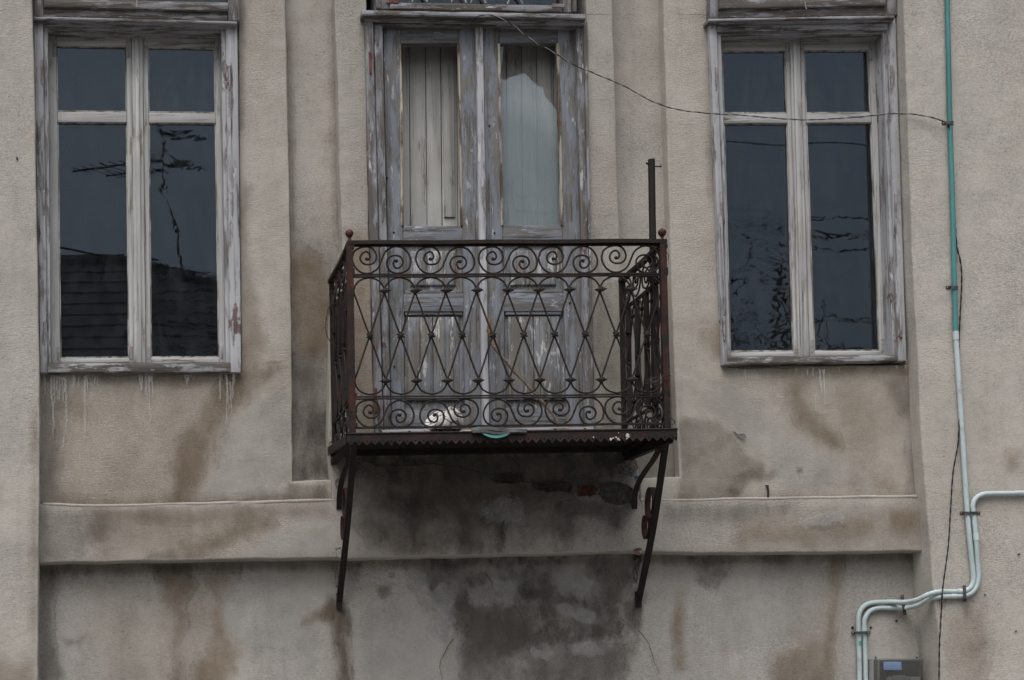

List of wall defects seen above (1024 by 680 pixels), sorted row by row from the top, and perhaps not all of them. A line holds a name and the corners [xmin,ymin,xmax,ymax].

spalling [492,474,633,505]